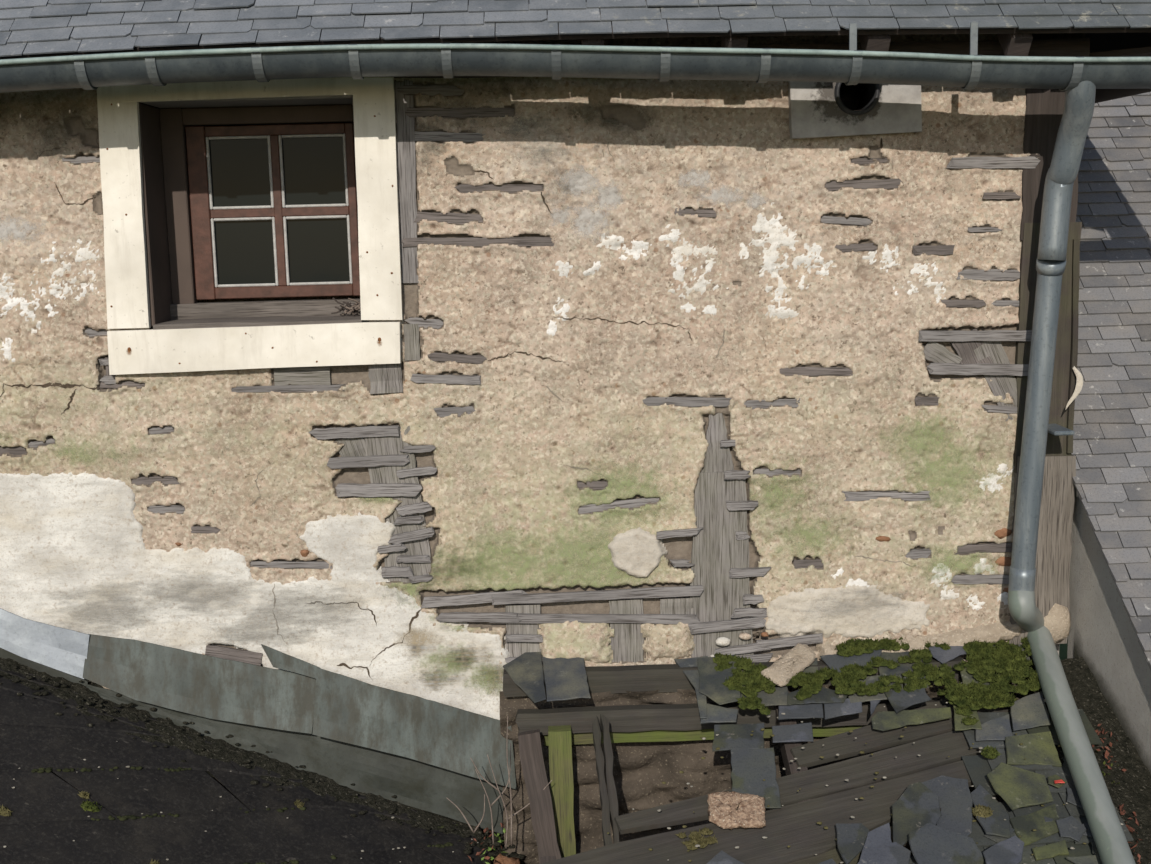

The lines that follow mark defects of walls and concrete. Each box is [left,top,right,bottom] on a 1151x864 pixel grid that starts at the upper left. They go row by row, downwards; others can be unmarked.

spalling [600,105,646,130]
spalling [231,79,554,395]
peeling [596,207,741,315]
peeling [738,202,1020,319]
peeling [547,297,570,336]
crack [0,382,101,414]
spalling [96,355,145,392]
spalling [779,363,853,377]
spalling [914,324,1032,427]
flaking render [0,394,1014,720]
crack [272,584,286,643]
crack [307,601,422,678]